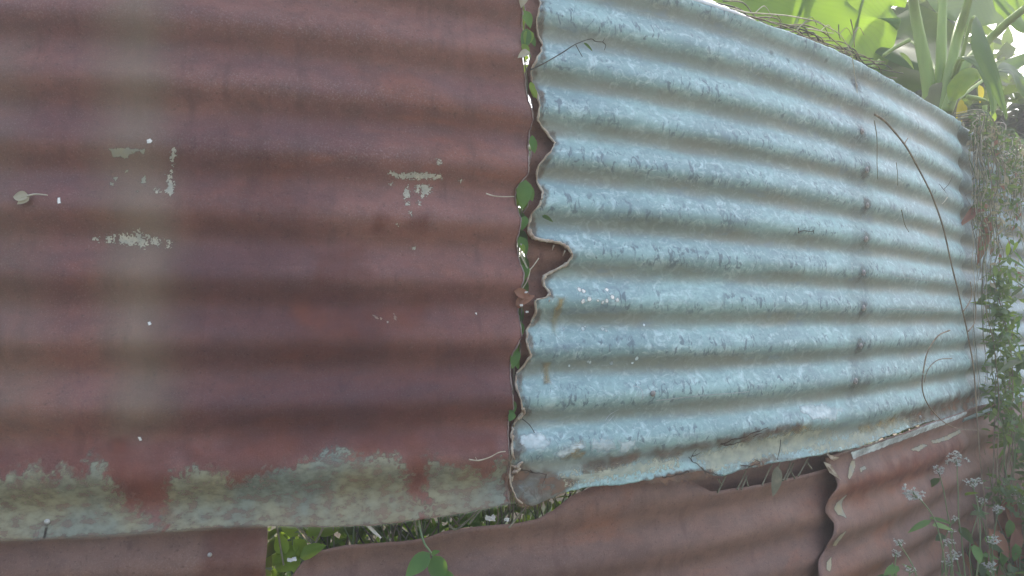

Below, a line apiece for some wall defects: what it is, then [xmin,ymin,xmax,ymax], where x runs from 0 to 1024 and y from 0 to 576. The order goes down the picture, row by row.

peeling [109,139,152,186]
peeling [137,147,177,197]
peeling [388,159,443,217]
peeling [92,228,173,250]
rust [506,466,576,507]
rust [648,469,714,485]